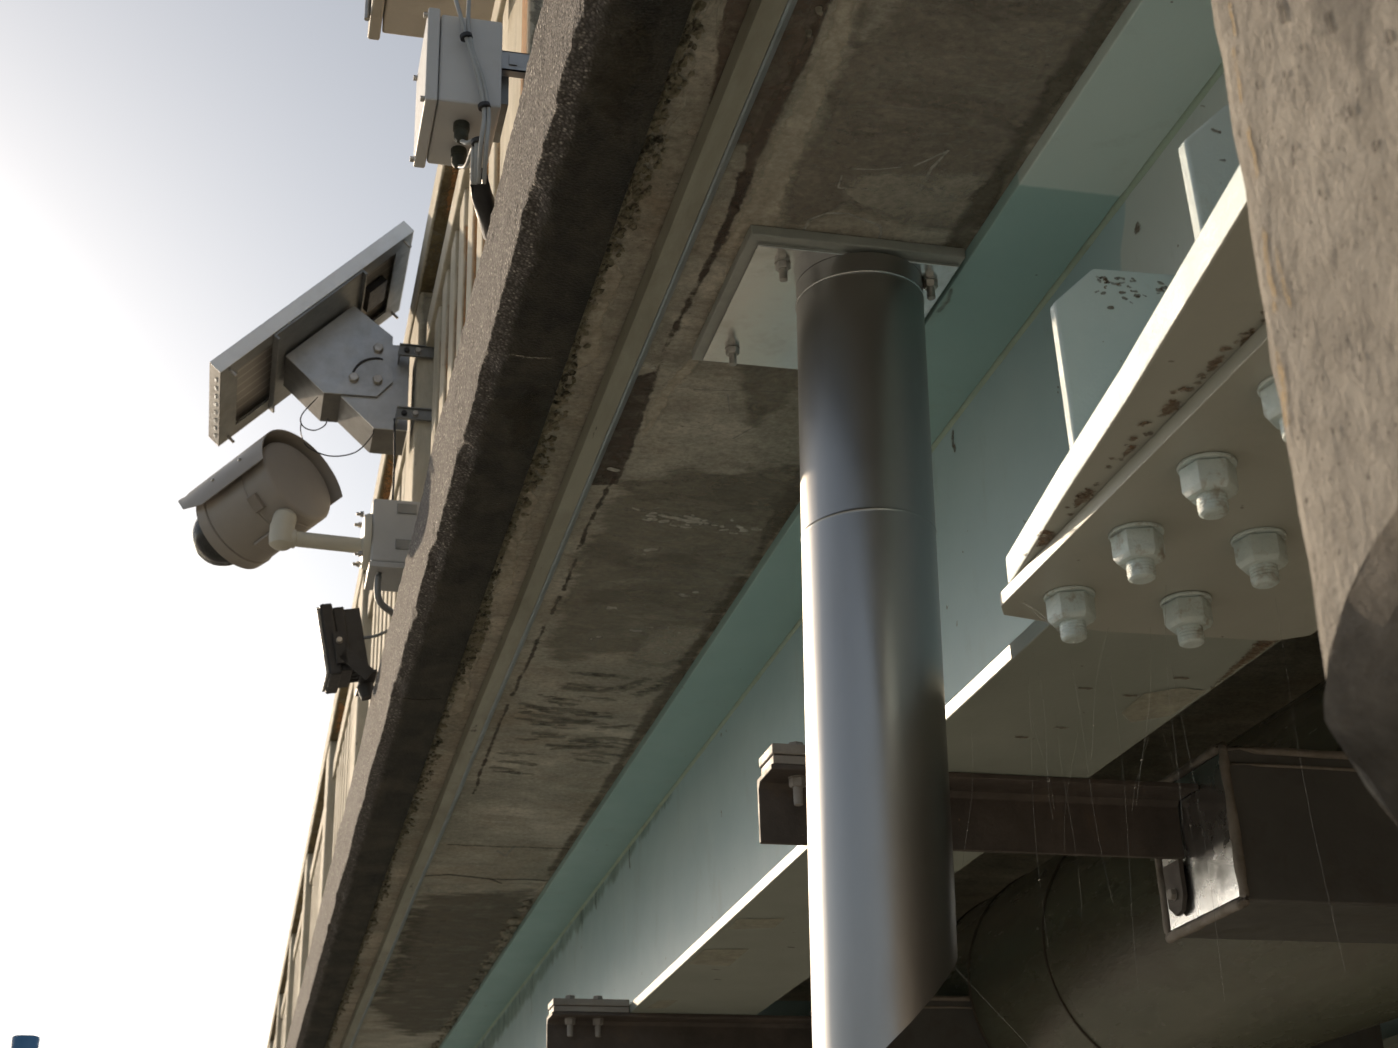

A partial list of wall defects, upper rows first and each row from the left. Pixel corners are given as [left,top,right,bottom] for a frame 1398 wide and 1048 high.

water stain [665,0,1123,345]
rust [1106,311,1266,468]
rust [1023,530,1055,556]
rust [1066,484,1097,516]
water stain [370,884,532,1036]